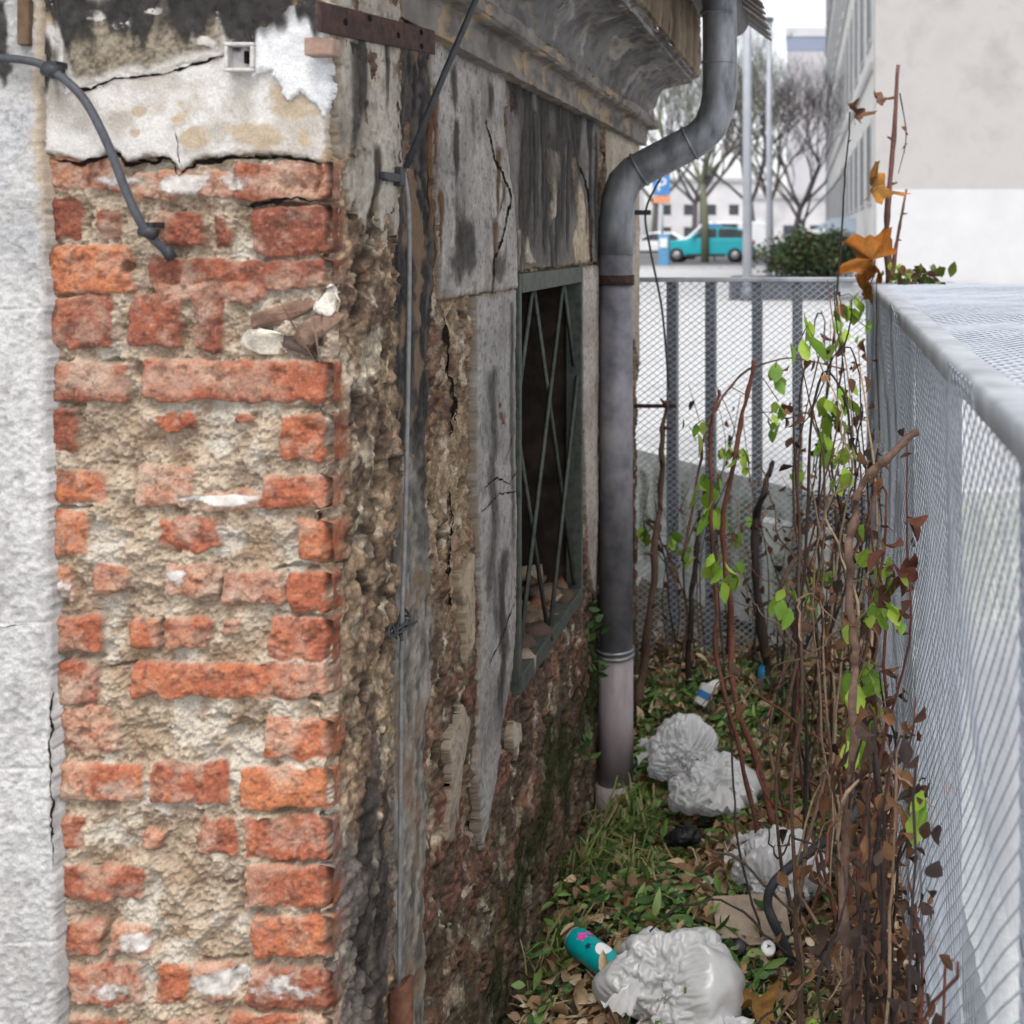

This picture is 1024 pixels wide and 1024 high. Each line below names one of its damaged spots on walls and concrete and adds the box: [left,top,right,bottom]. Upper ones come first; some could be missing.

water stain [44,0,320,97]
rust [304,1,435,58]
crack [51,127,320,176]
water stain [452,199,475,282]
crack [486,120,512,294]
water stain [509,82,598,268]
spalling [44,0,639,1024]
crack [47,688,55,863]